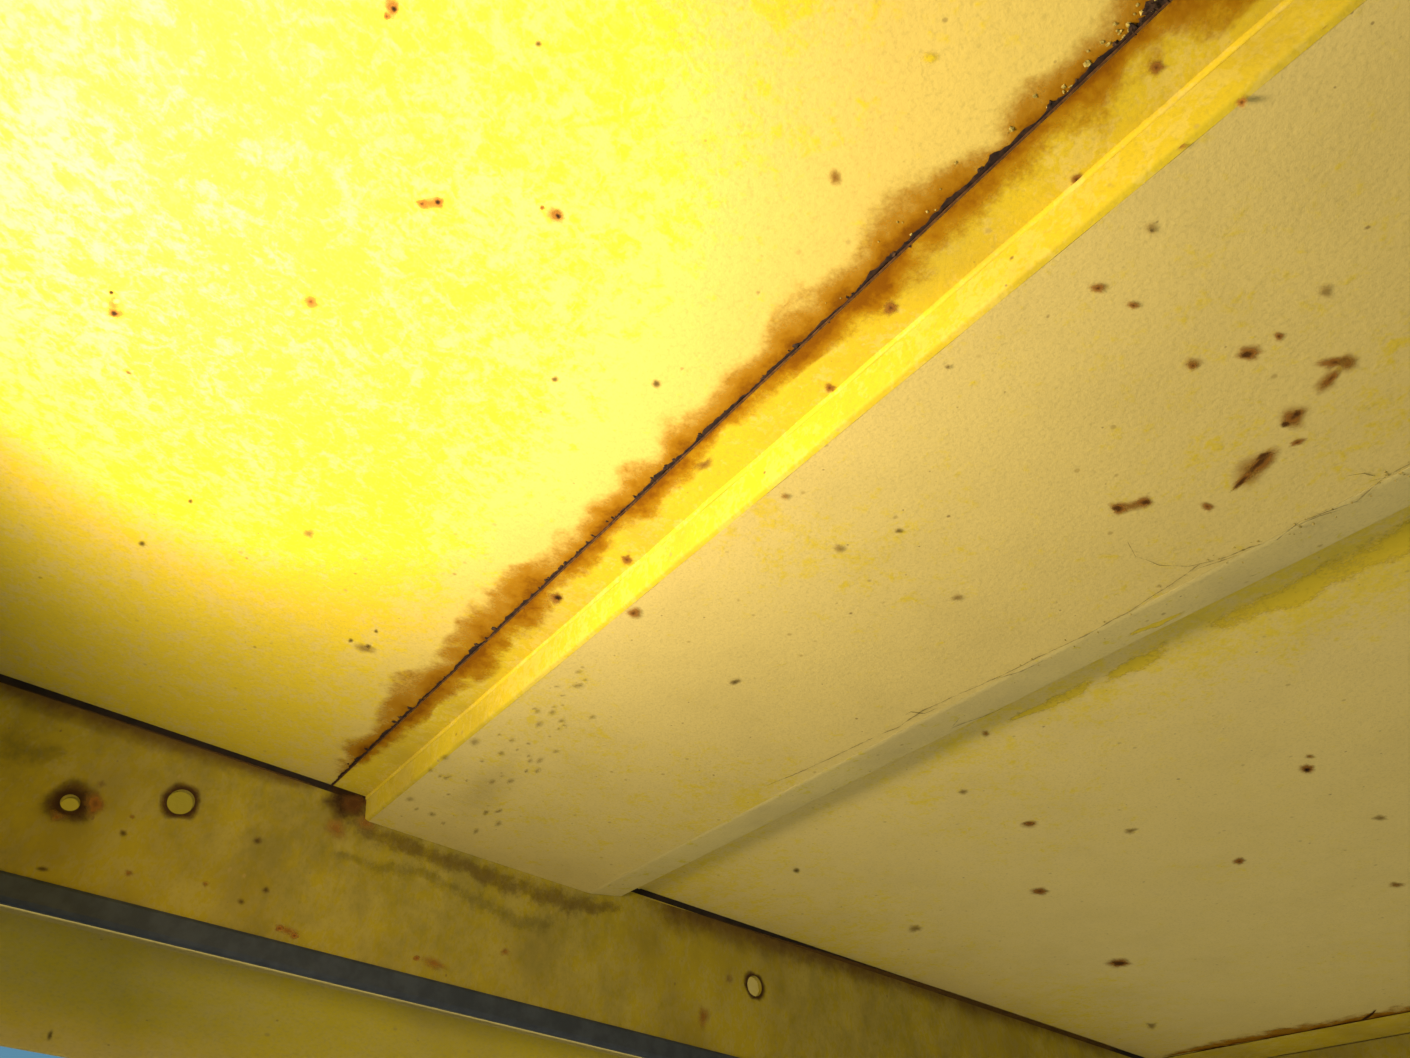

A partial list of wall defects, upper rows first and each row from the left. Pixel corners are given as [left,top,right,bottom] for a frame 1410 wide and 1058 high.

corrosion [101,291,123,318]
corrosion [303,295,319,308]
corrosion [1239,348,1258,360]
corrosion [1319,358,1354,389]
corrosion [325,0,1255,836]
corrosion [1281,411,1304,446]
corrosion [1234,451,1275,489]
water stain [0,681,307,784]
corrosion [44,783,103,821]